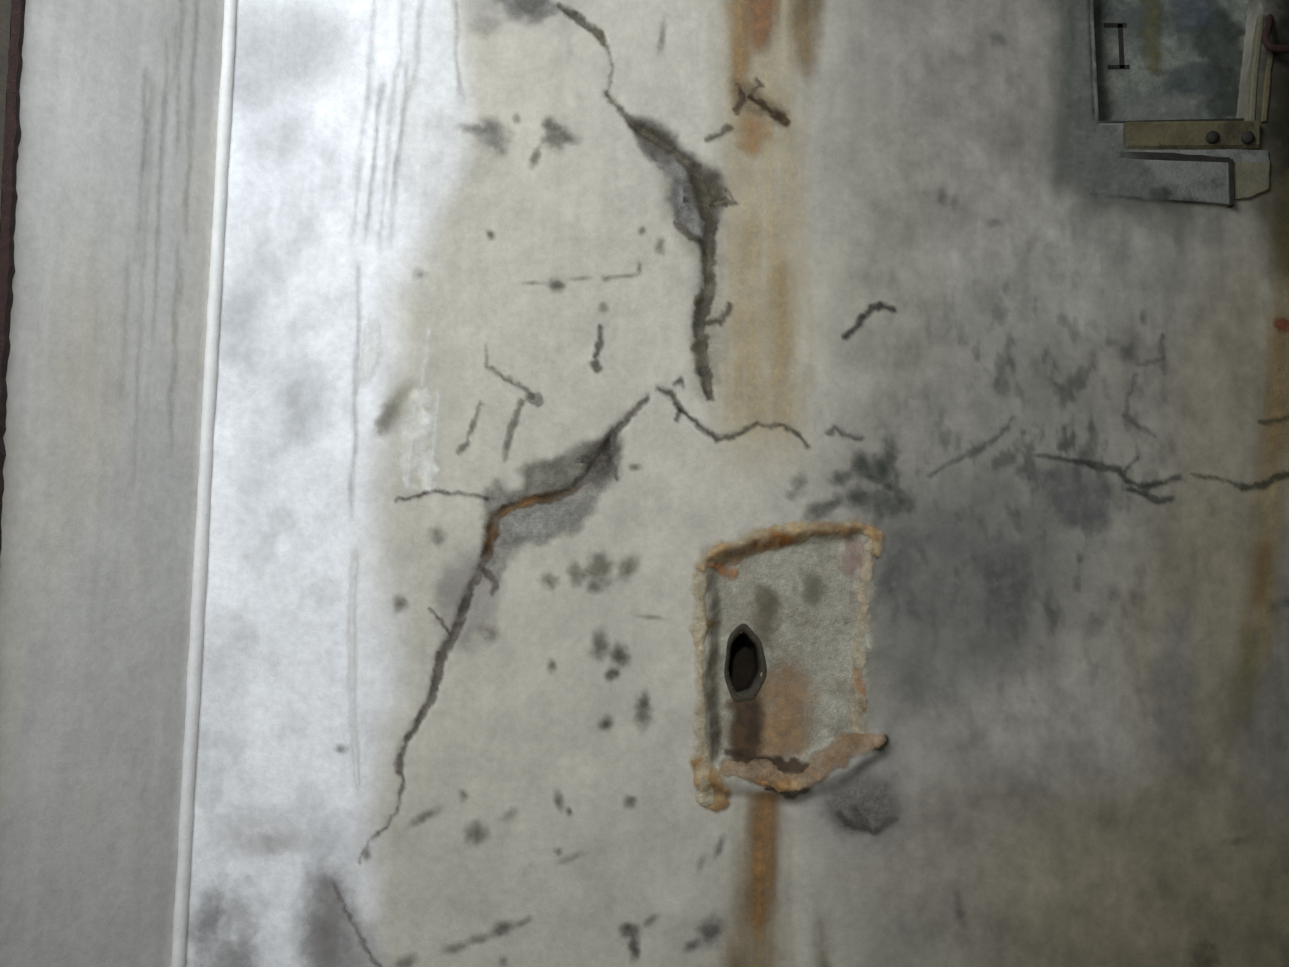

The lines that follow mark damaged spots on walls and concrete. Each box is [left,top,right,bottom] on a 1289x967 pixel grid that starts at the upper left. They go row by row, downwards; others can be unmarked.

crack [557,3,608,48]
spalling [633,121,722,248]
water stain [1056,0,1169,200]
water stain [1265,0,1289,268]
crack [842,301,895,338]
spalling [485,434,621,577]
crack [377,90,862,834]
water stain [835,450,891,502]
crack [1037,454,1289,503]